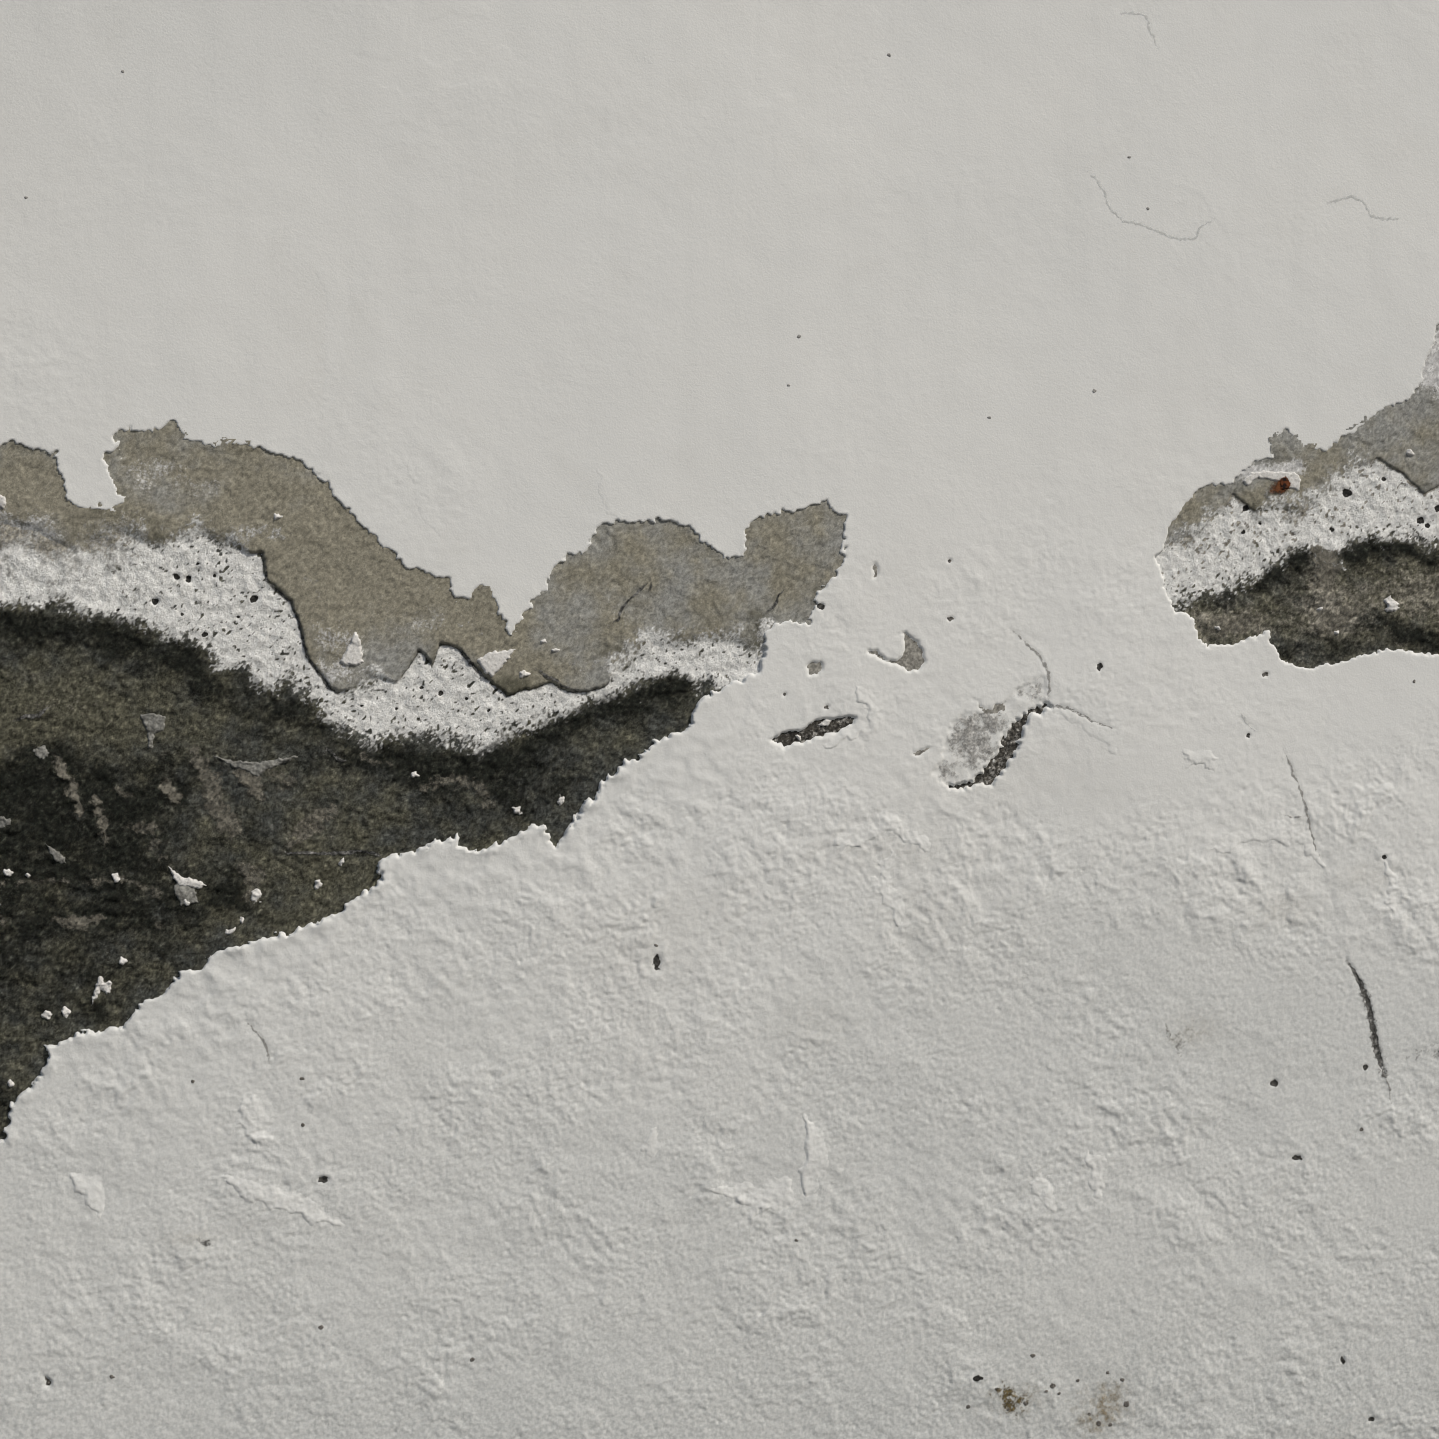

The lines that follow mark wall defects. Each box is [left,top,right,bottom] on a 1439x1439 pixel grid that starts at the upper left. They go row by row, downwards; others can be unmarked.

corrosion [1270,476,1291,493]
peeling [1155,324,1439,669]
peeling [868,632,924,671]
peeling [0,420,854,1139]
spalling [939,685,1047,789]
crack [1348,963,1391,1091]